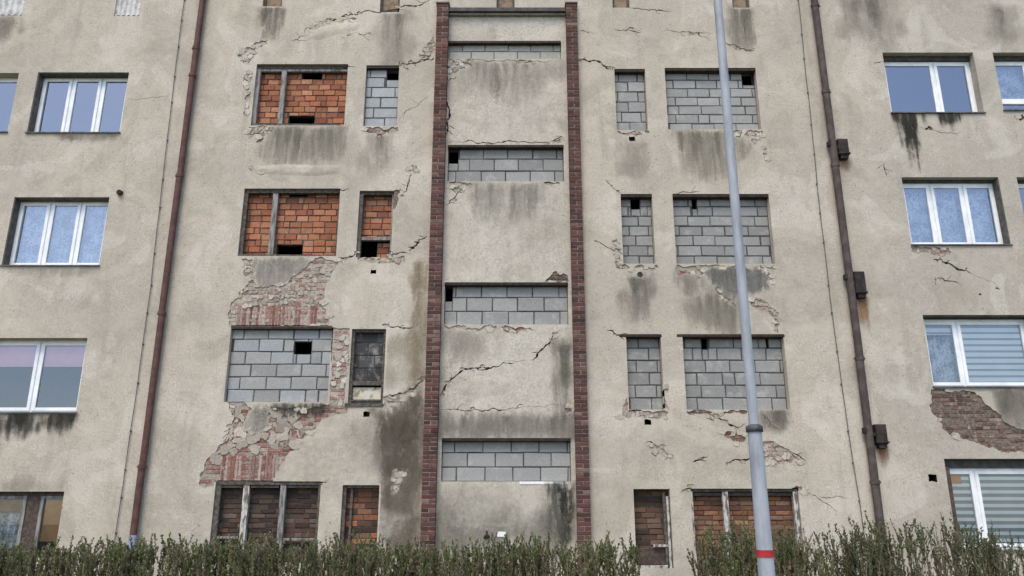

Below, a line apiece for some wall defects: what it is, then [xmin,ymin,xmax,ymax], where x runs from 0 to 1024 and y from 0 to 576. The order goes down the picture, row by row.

crack [326,6,417,37]
peeling [236,38,274,144]
damp [892,113,925,164]
damp [939,113,960,123]
crack [937,258,965,282]
flaking render [199,258,350,489]
crack [383,332,558,414]
damp [0,414,75,438]
damp [372,397,424,552]
flaking render [763,441,805,468]
flaking render [929,388,1024,453]
damp [435,481,574,552]